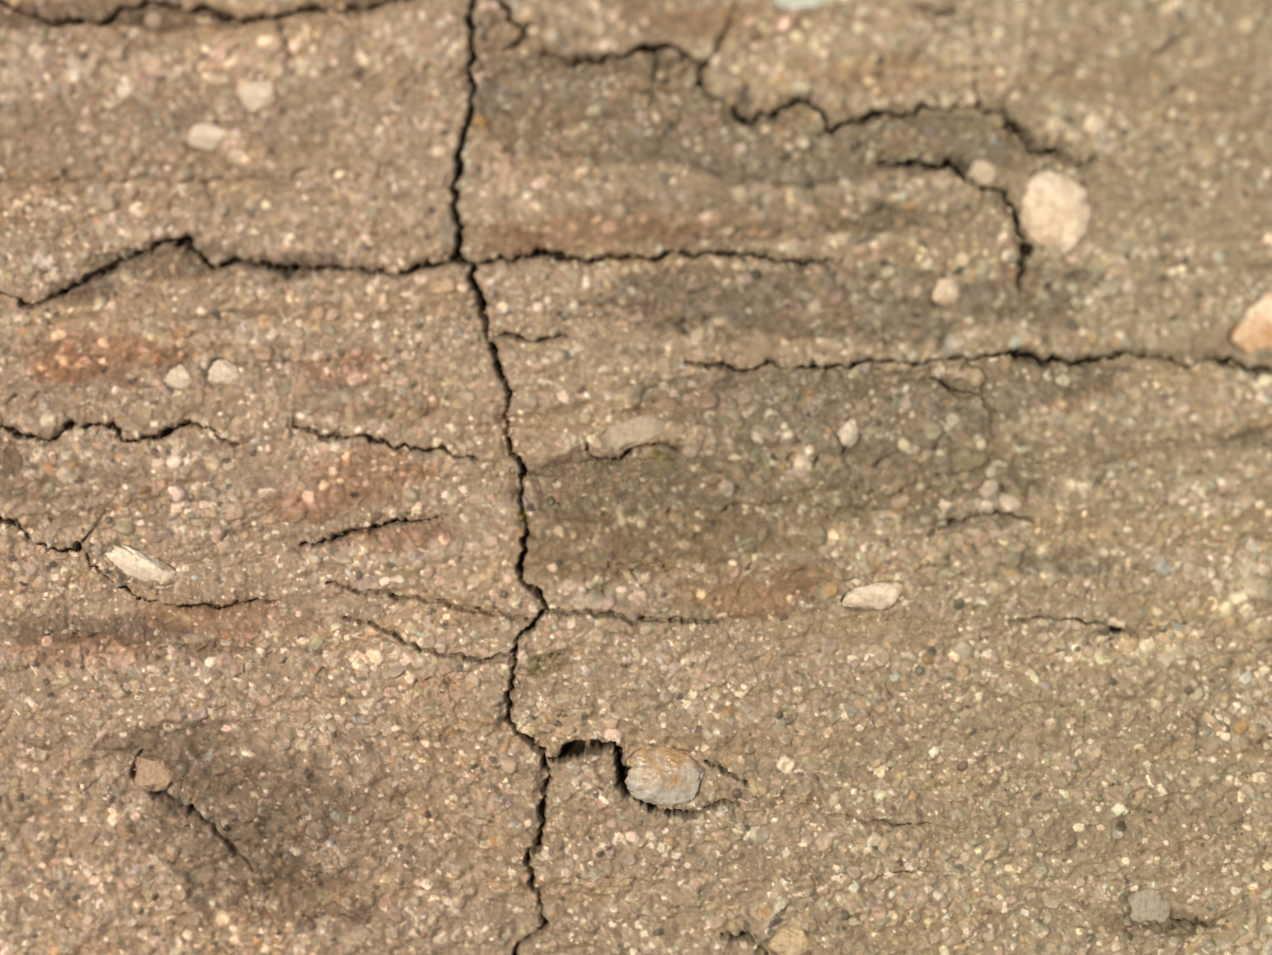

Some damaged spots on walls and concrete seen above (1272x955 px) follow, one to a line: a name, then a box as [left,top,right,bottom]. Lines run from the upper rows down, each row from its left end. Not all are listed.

crack [562,45,936,133]
crack [999,110,1058,154]
crack [882,158,1026,288]
crack [686,350,1123,393]
crack [1163,357,1270,371]
crack [0,0,824,955]